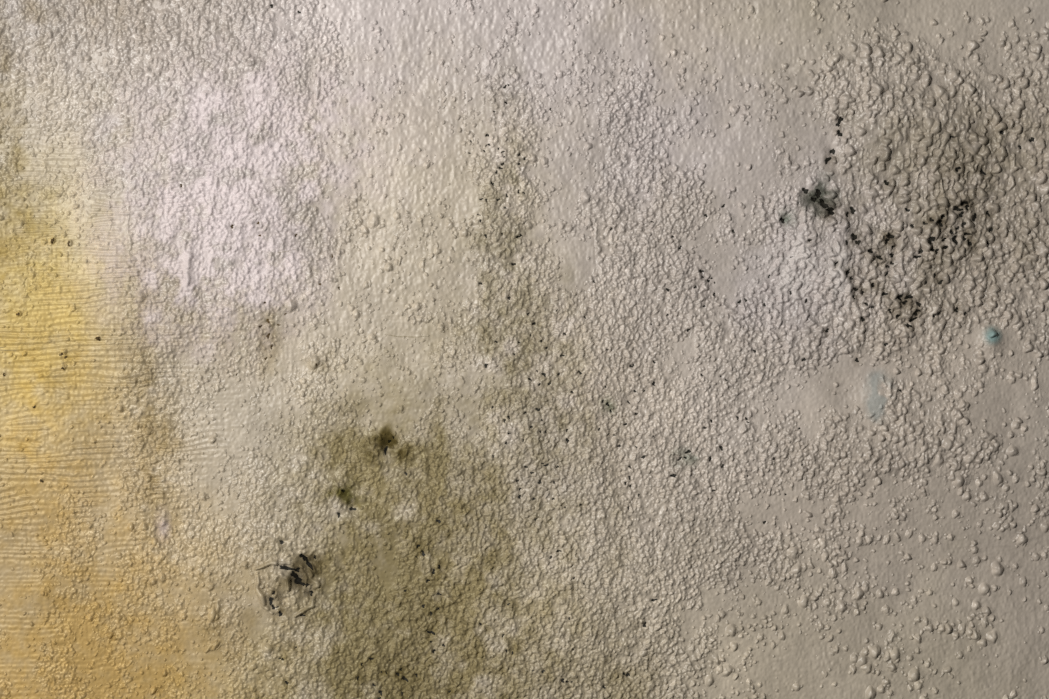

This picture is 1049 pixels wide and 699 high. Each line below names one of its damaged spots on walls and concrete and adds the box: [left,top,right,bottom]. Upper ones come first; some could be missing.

damp [802,188,856,217]
damp [845,232,895,276]
damp [905,201,993,259]
damp [834,260,921,328]
damp [84,77,315,573]
flaking render [187,17,817,699]
damp [279,553,316,596]